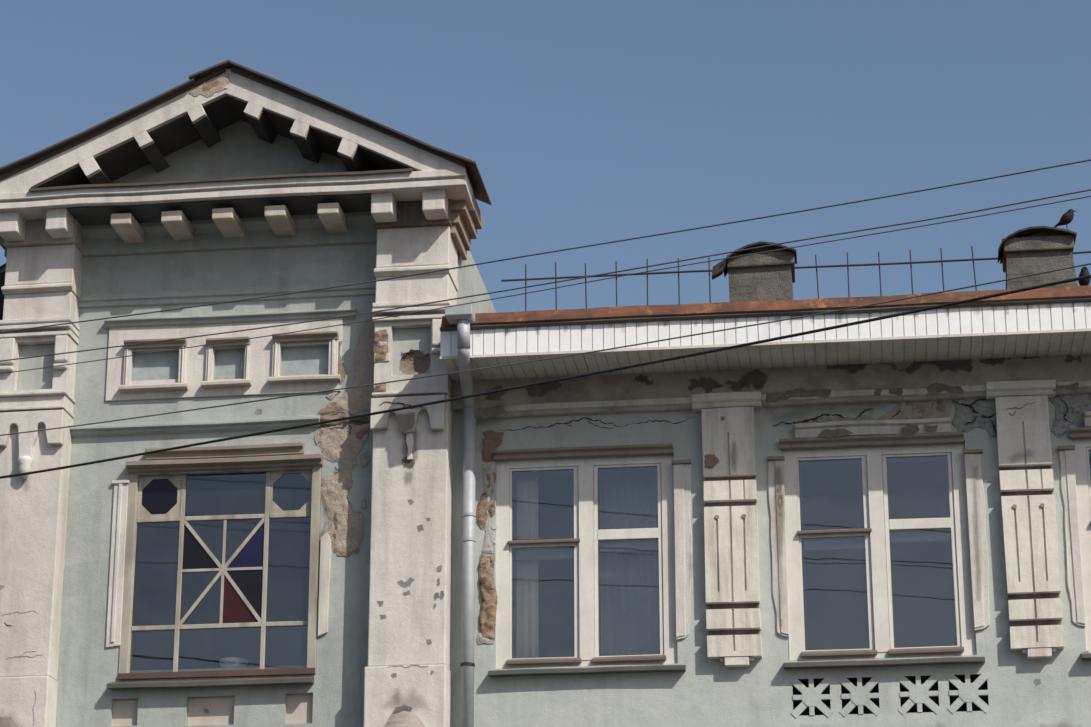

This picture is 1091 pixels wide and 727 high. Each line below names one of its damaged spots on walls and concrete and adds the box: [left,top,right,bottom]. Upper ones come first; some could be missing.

spalling [399,349,431,375]
peeling [688,369,832,402]
peeling [806,356,1039,439]
peeling [314,317,388,557]
crack [325,401,424,434]
crack [499,417,691,431]
crack [953,398,1073,436]
flaking render [477,428,504,644]
peeling [397,578,414,595]
peeling [434,565,444,608]